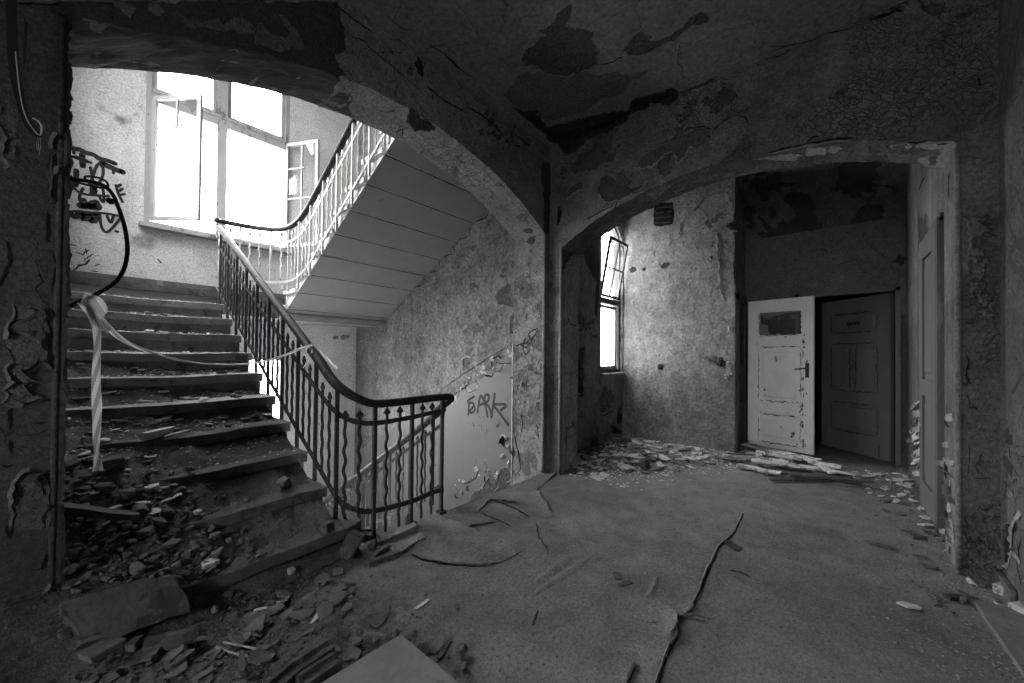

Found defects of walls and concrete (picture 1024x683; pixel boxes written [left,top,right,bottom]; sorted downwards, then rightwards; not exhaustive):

flaking render [68,0,353,118]
crack [329,0,531,149]
flaking render [520,2,600,76]
flaking render [621,11,711,56]
crack [769,8,903,59]
spalling [512,76,718,154]
flaking render [1,304,53,408]
flaking render [451,345,541,502]
flaking render [906,401,920,477]
flaking render [7,467,52,531]
flaking render [900,442,954,552]
flaking render [997,511,1021,570]